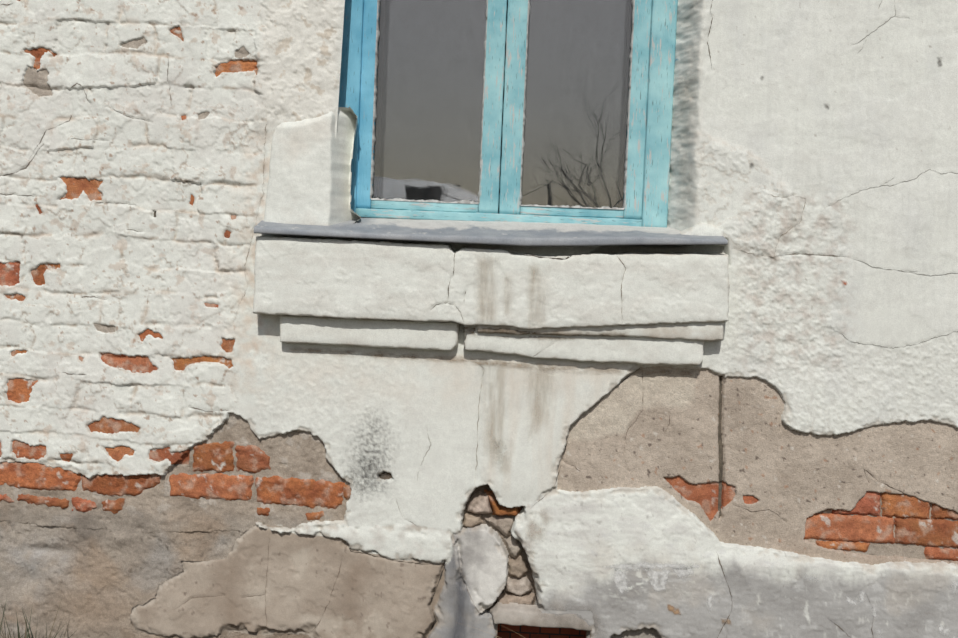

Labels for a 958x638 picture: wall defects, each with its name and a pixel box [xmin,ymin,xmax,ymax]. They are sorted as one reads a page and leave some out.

flaking render [23,48,57,97]
peeling [215,47,258,77]
peeling [60,177,103,201]
crack [734,169,958,276]
peeling [0,261,60,301]
peeling [101,353,158,373]
peeling [171,338,235,371]
crack [718,376,784,520]
spalling [557,366,958,565]
spalling [0,413,351,638]
spalling [463,484,537,610]
spalling [612,628,661,638]